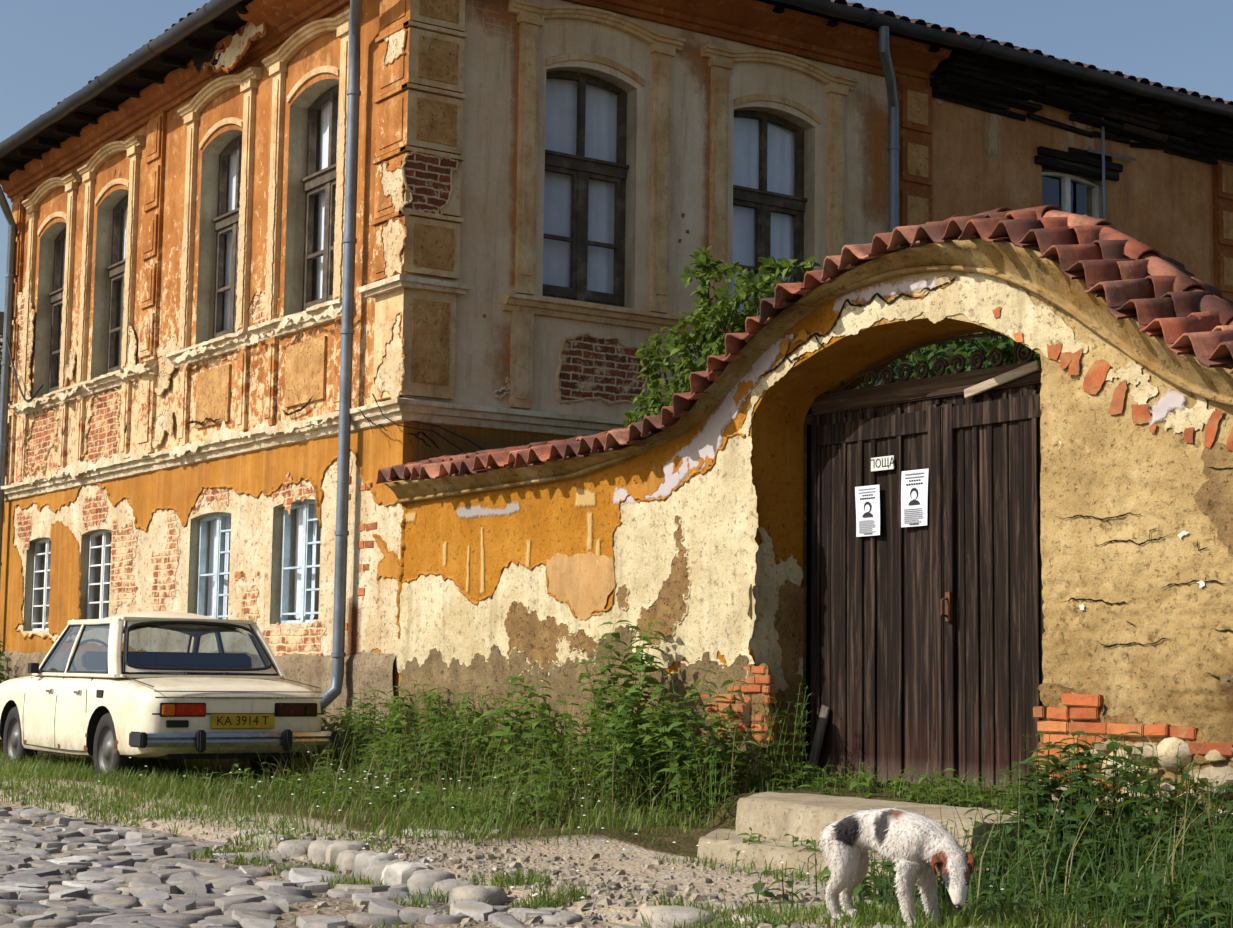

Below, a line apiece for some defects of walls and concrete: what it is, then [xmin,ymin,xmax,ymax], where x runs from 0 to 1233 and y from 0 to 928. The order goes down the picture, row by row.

flaking render [59,214,87,388]
flaking render [121,191,137,368]
flaking render [152,214,188,449]
flaking render [380,150,459,278]
flaking render [12,256,1233,787]
crack [1064,597,1167,648]
crack [1054,512,1227,589]